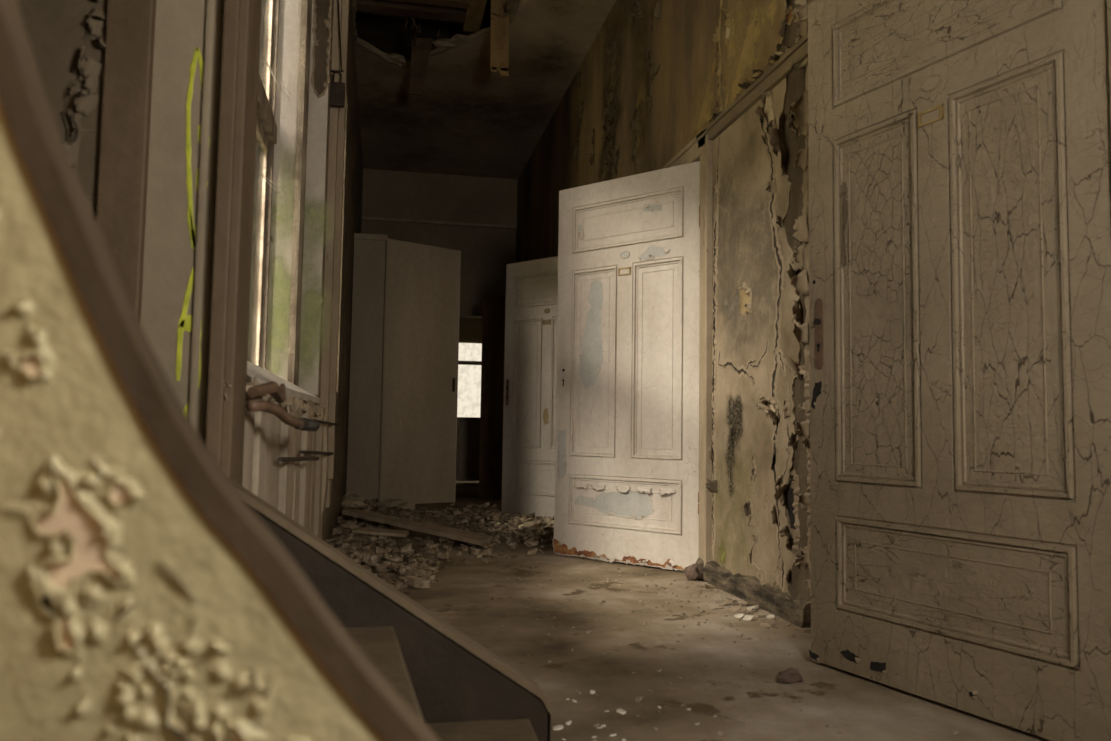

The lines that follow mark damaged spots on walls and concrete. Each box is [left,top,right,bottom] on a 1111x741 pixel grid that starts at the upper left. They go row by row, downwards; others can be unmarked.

peeling [23,453,147,664]
water stain [726,397,743,494]
crack [709,0,791,592]
peeling [736,0,823,603]